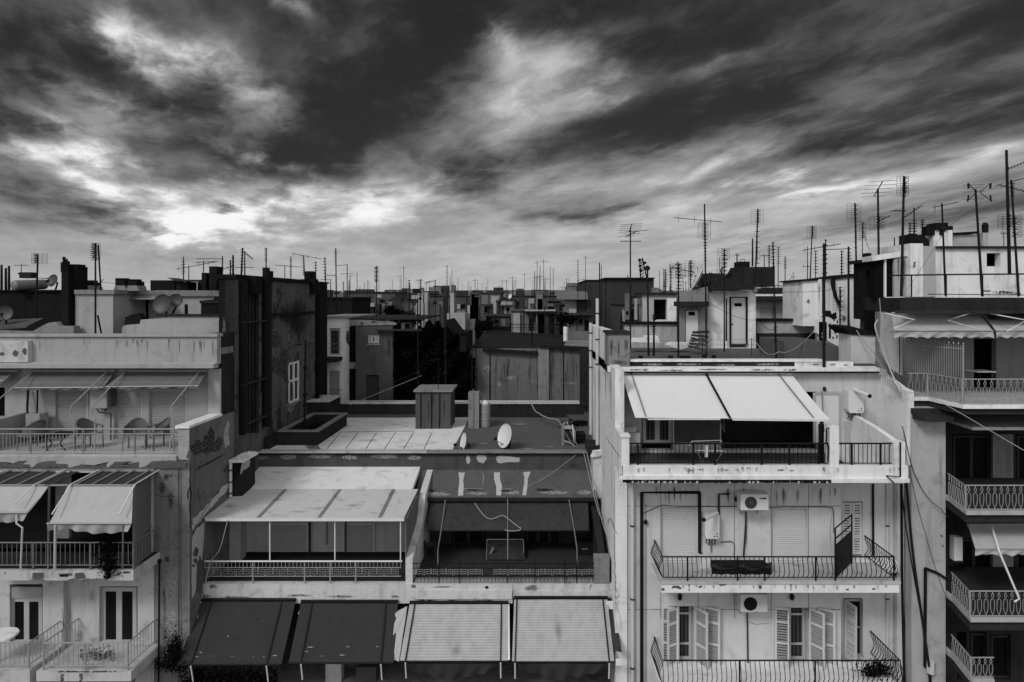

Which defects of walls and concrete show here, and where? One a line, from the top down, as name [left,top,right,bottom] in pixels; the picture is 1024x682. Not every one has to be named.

spalling [0,318,234,468]